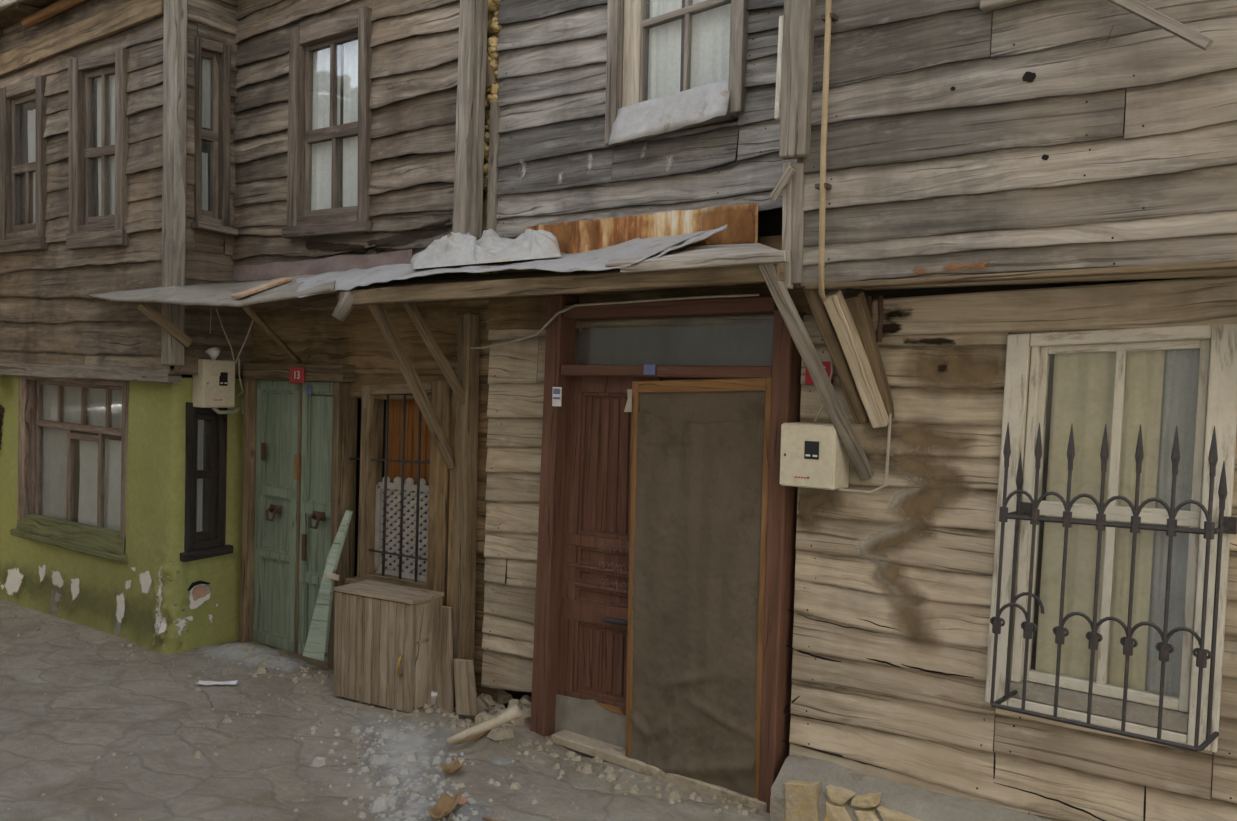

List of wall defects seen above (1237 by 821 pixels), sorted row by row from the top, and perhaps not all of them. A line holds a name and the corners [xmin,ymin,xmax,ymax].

corrosion [551,221,598,254]
corrosion [701,207,755,245]
peeling [1,567,24,596]
peeling [39,564,80,612]
spalling [115,563,218,641]